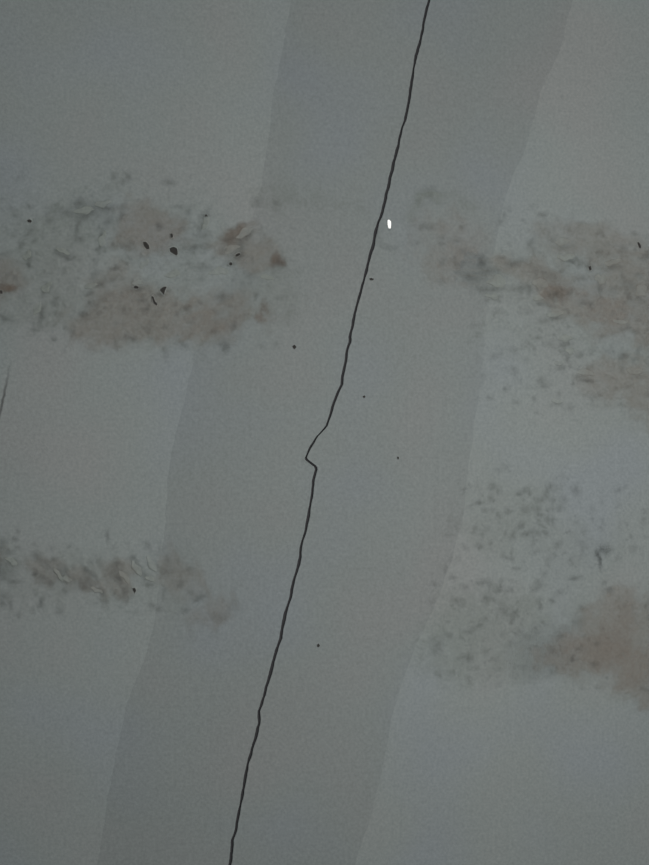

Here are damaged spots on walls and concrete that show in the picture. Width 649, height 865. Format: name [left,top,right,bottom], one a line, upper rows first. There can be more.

crack [226,0,433,865]